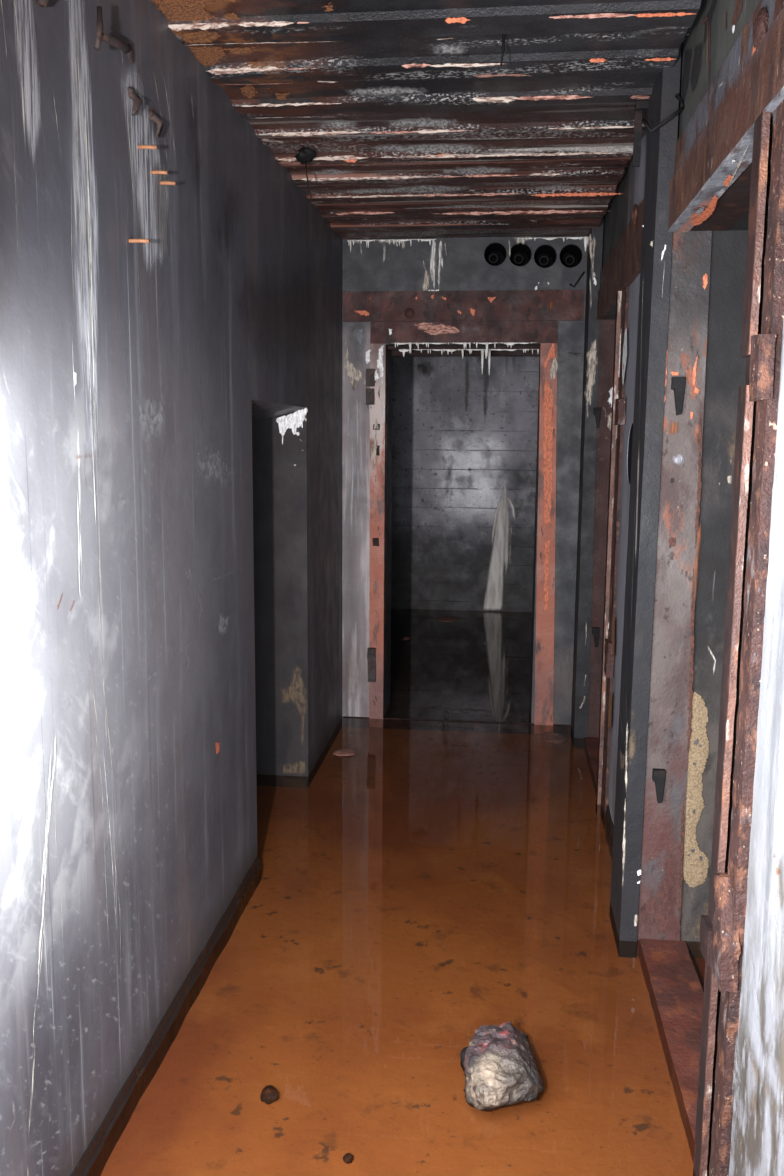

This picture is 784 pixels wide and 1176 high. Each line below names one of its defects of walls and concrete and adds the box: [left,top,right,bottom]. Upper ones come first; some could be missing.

corrosion [151,0,257,66]
damp [348,239,446,291]
damp [509,235,597,293]
damp [395,342,539,415]
peeling [586,340,596,416]
corrosion [687,412,702,770]
spalling [683,692,709,888]